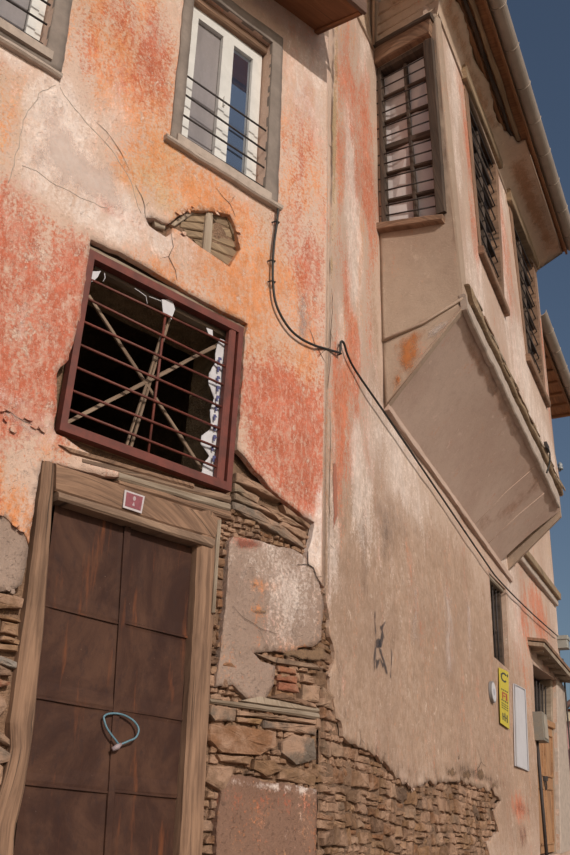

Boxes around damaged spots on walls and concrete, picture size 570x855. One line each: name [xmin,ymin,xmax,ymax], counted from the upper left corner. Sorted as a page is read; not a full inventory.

flaking render [0,509,28,594]